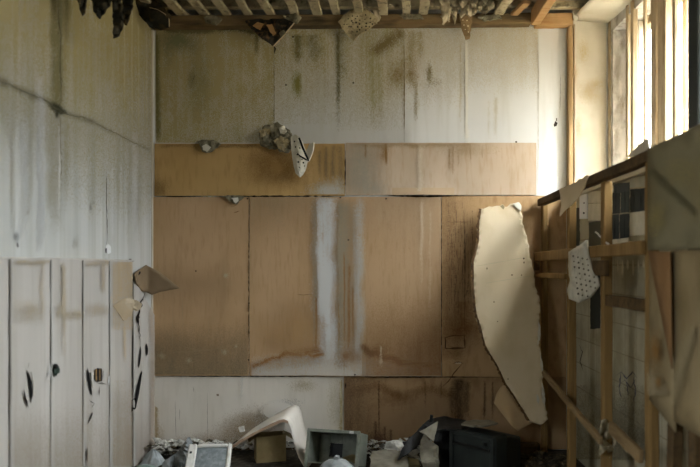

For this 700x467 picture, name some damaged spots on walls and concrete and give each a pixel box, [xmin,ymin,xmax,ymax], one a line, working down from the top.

crack [0,7,151,190]
peeling [134,265,179,295]
water stain [0,0,538,467]